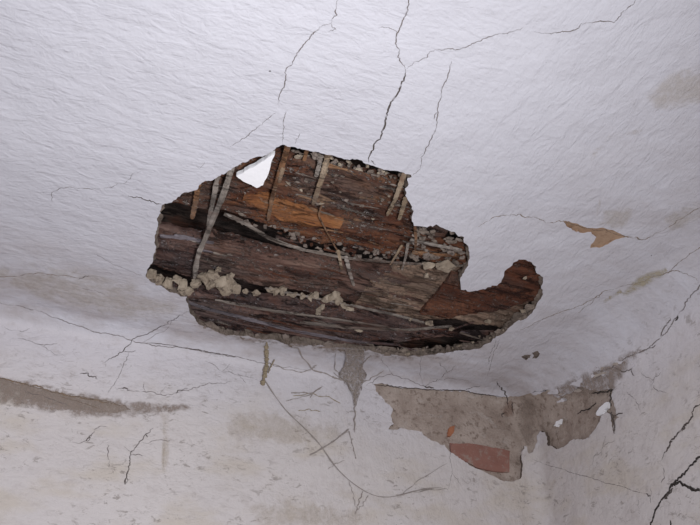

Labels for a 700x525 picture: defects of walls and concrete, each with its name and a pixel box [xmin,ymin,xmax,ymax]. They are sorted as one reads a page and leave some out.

crack [232,10,337,146]
crack [368,0,428,164]
crack [413,28,522,175]
damp [0,378,188,416]
crack [0,303,298,408]
flaking render [146,204,324,346]
flaking render [236,151,275,188]
flaking render [333,264,543,357]
crack [368,345,514,417]
flaking render [374,360,635,490]
flaking render [564,221,624,248]
crack [546,247,700,525]